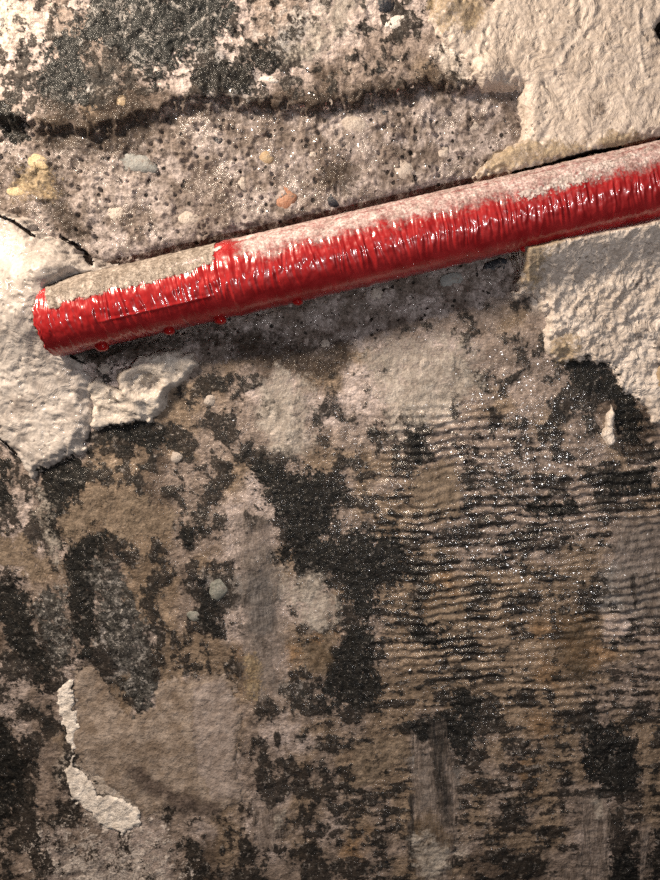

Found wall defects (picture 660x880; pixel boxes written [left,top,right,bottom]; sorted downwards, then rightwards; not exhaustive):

crack [652,22,660,39]
water stain [0,0,358,241]
crack [512,146,624,174]
water stain [555,355,657,496]
water stain [0,447,159,719]
water stain [75,328,485,714]
water stain [520,495,582,522]
water stain [613,516,660,619]
water stain [20,811,200,880]
peeling [56,665,245,835]
water stain [399,684,483,880]
water stain [553,717,660,880]